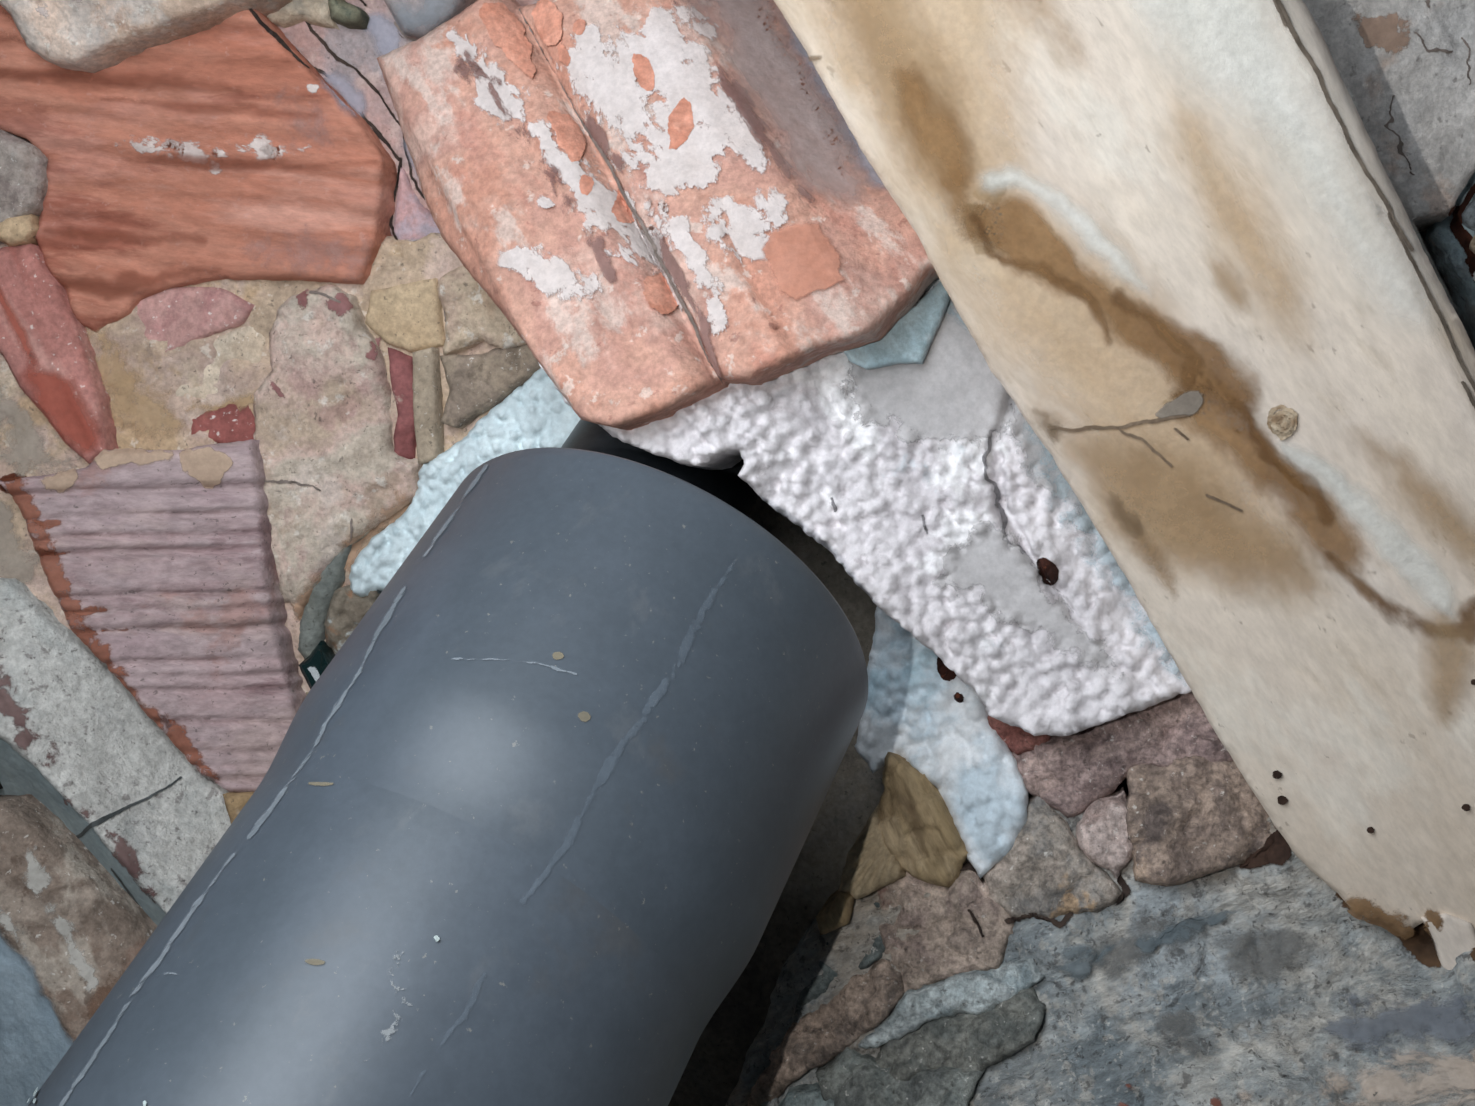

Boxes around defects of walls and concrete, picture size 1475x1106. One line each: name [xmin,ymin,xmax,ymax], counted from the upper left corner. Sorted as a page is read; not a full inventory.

peeling [446,0,843,335]
peeling [843,281,950,370]
leakage [837,0,1475,703]